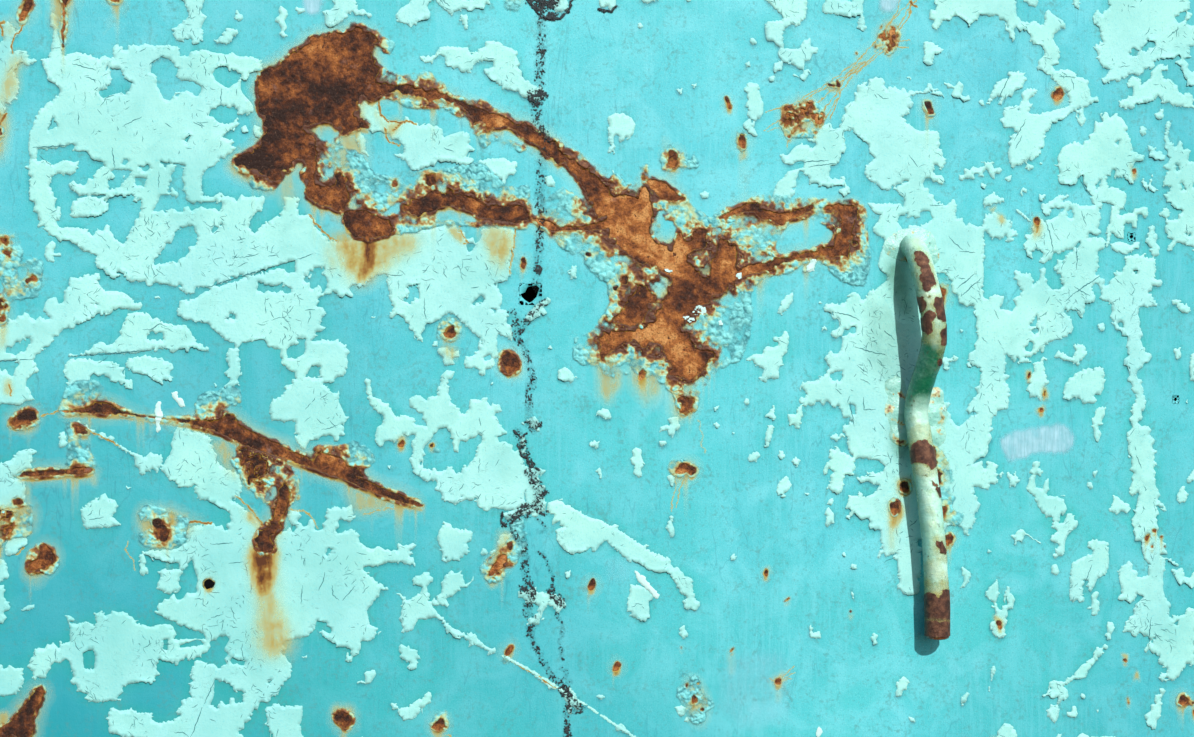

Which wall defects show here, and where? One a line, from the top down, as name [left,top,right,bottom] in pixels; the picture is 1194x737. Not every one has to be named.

corrosion [0,234,44,326]
corrosion [0,684,46,737]
corrosion [0,380,424,652]
peeling [0,0,700,737]
corrosion [232,23,871,417]
peeling [743,0,1194,737]